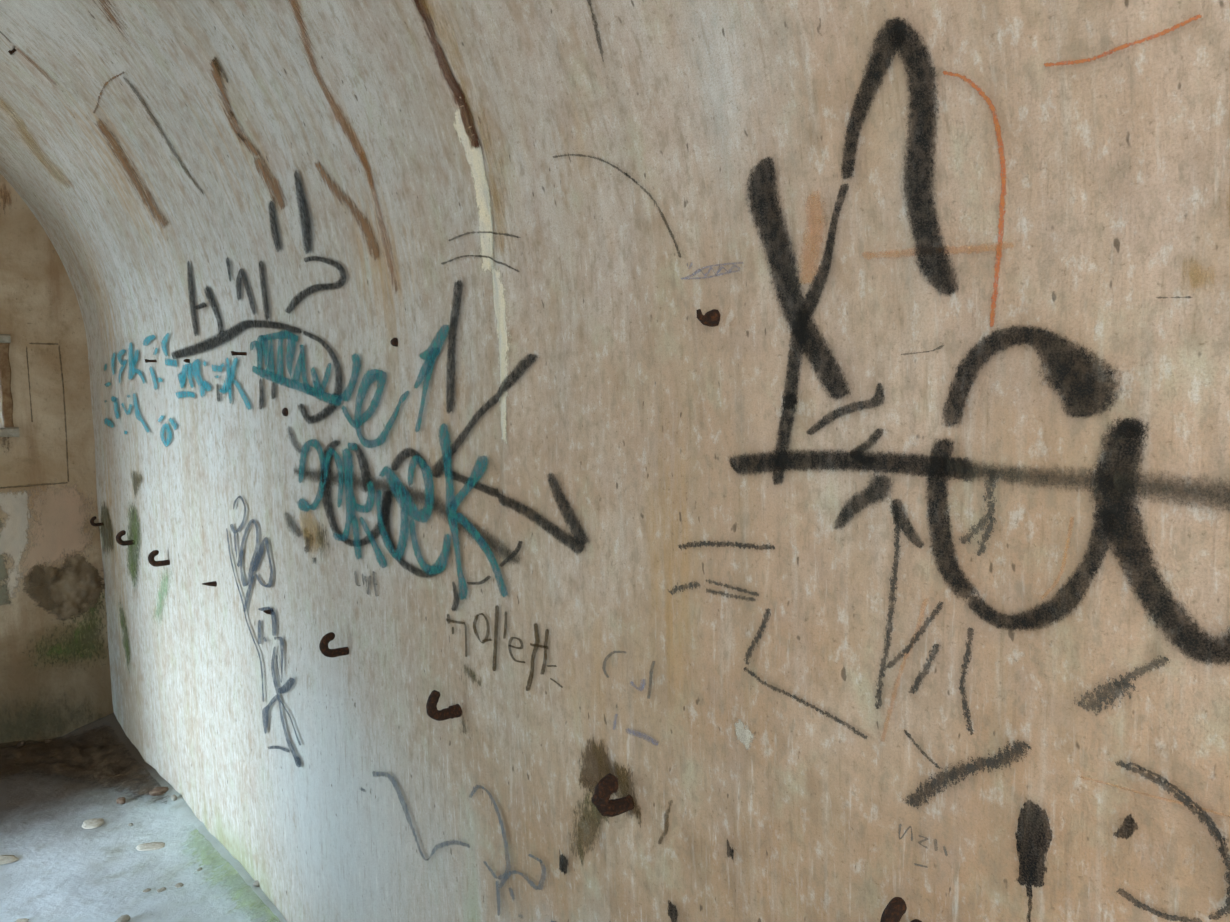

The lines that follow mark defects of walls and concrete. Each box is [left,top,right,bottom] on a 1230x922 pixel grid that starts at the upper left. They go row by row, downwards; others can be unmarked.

leakage [0,555,11,605]
peeling [0,484,105,620]